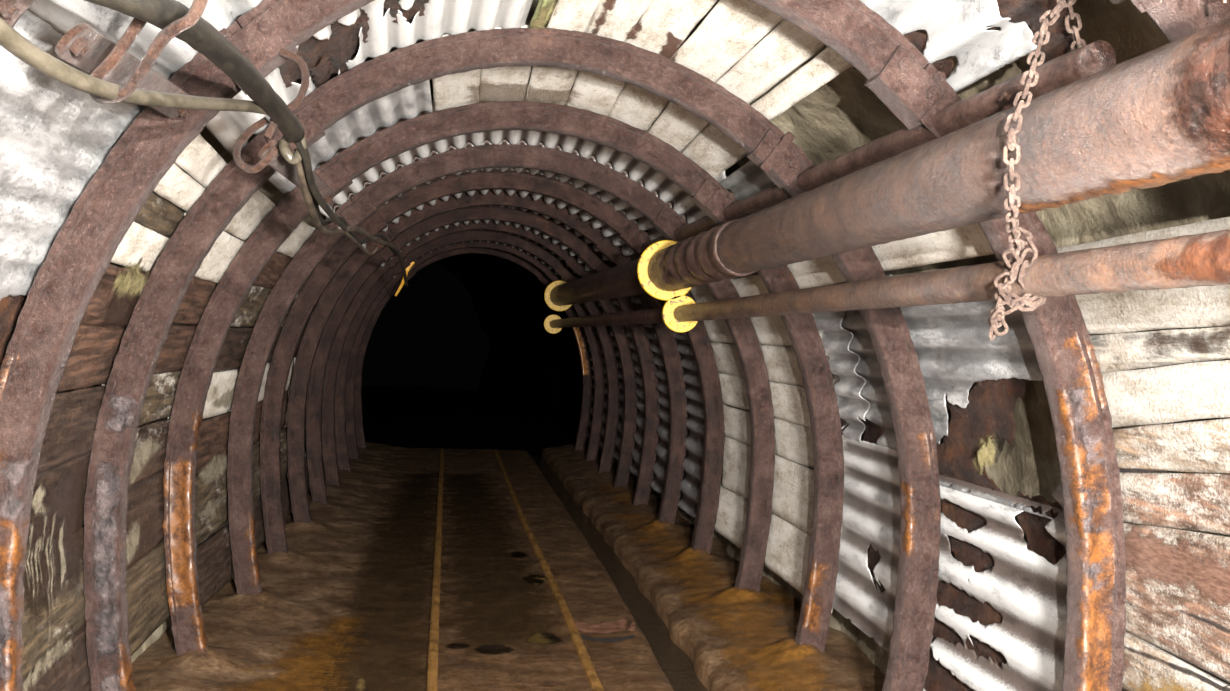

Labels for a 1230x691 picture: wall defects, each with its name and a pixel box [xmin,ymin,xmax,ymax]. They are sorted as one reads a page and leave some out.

rust [1154,232,1230,284]
rust [0,520,24,691]
rust [162,413,208,652]
rust [1056,334,1192,691]
peeling [1124,525,1230,629]